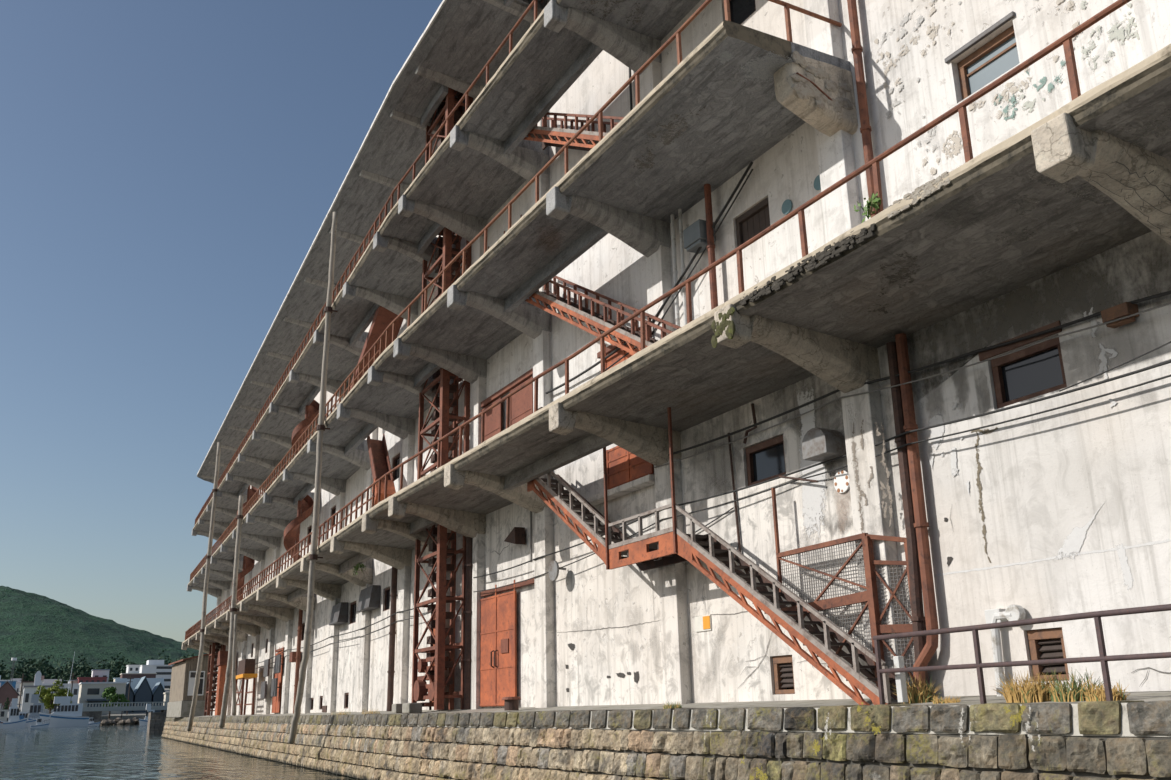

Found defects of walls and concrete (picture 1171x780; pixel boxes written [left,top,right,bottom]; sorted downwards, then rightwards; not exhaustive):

spalling [789,51,853,113]
peeling [865,0,963,119]
peeling [968,55,1066,122]
peeling [1056,0,1140,77]
spalling [738,115,963,315]
crack [1088,161,1171,242]